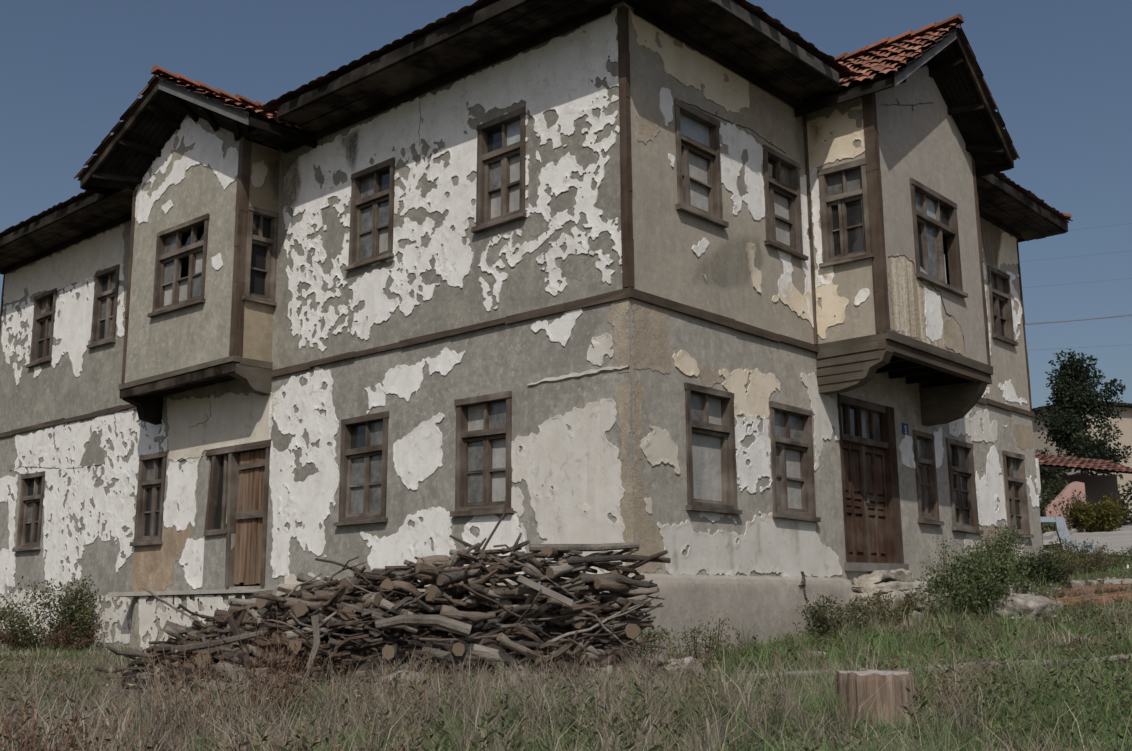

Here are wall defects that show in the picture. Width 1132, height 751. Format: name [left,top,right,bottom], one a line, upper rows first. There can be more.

peeling [1,118,268,386]
peeling [0,367,340,650]
peeling [365,347,466,414]
peeling [360,398,625,574]
peeling [283,8,765,352]
peeling [644,497,842,577]
peeling [719,368,780,494]
peeling [746,103,870,339]
peeling [800,372,840,470]
peeling [924,287,943,342]
peeling [933,380,1029,569]
peeling [982,232,1022,356]